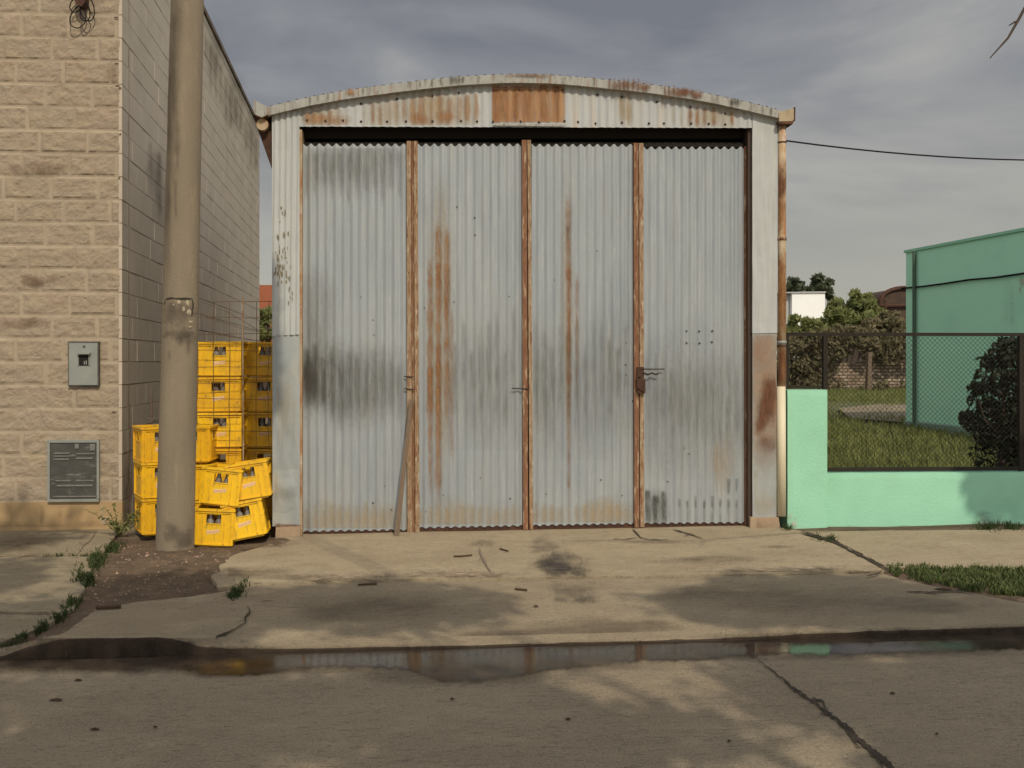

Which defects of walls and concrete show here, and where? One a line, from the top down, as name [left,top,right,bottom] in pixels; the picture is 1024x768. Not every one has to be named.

corrosion [492,74,565,122]
corrosion [665,86,701,98]
corrosion [428,229,449,478]
water stain [304,366,315,391]
corrosion [753,336,786,441]
crack [801,532,888,576]
crack [757,658,894,768]